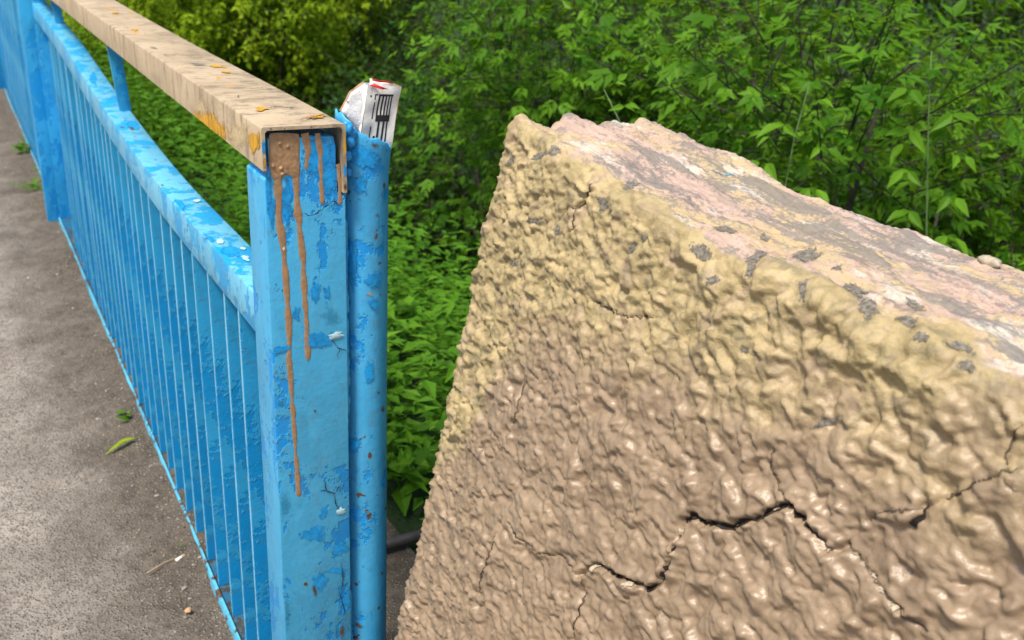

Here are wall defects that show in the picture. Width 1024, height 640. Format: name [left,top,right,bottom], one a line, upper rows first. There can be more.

peeling [193,99,293,232]
peeling [203,233,250,261]
peeling [310,281,331,304]
peeling [305,331,344,348]
peeling [348,438,361,454]
crack [873,426,1021,527]
peeling [298,506,346,542]
crack [479,450,925,637]
peeling [312,540,349,592]